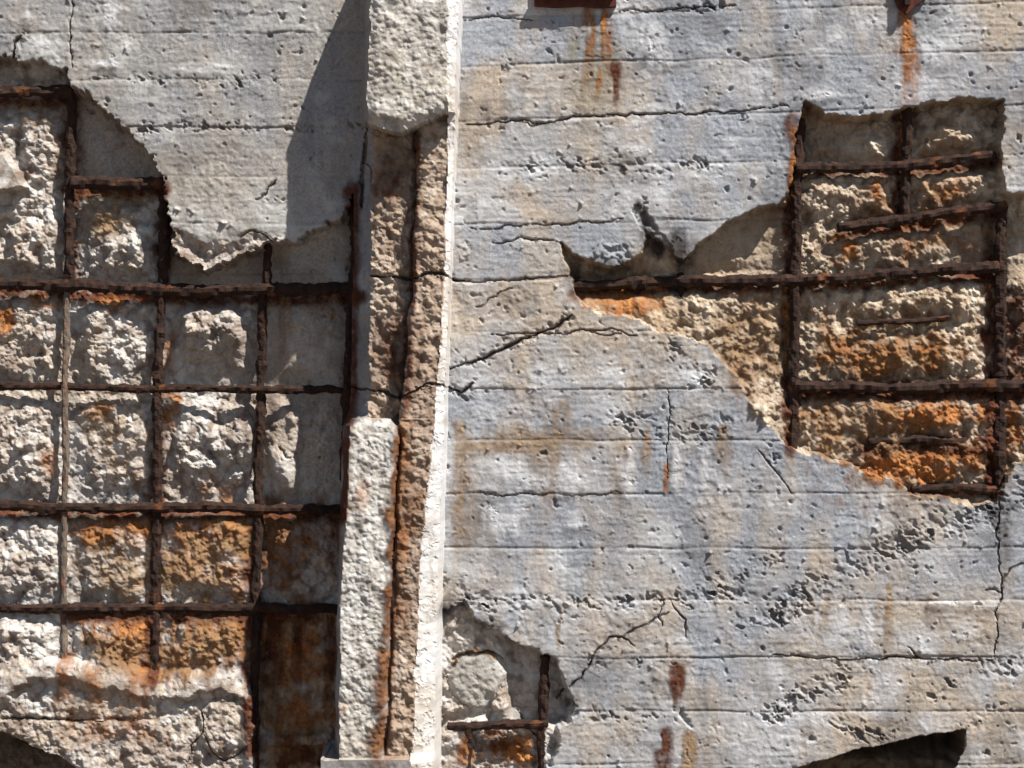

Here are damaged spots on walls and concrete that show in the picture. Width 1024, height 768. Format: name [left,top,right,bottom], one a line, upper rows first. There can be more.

crack [467,104,789,128]
spalling [0,54,354,768]
corrosion [0,96,367,768]
spalling [385,515,399,738]
corrosion [383,427,423,637]
crack [357,315,638,399]
crack [556,599,687,699]
corrosion [669,663,685,704]
corrosion [570,285,802,454]
spalling [441,96,1024,768]
crack [768,496,1024,662]
corrosion [782,113,1024,498]